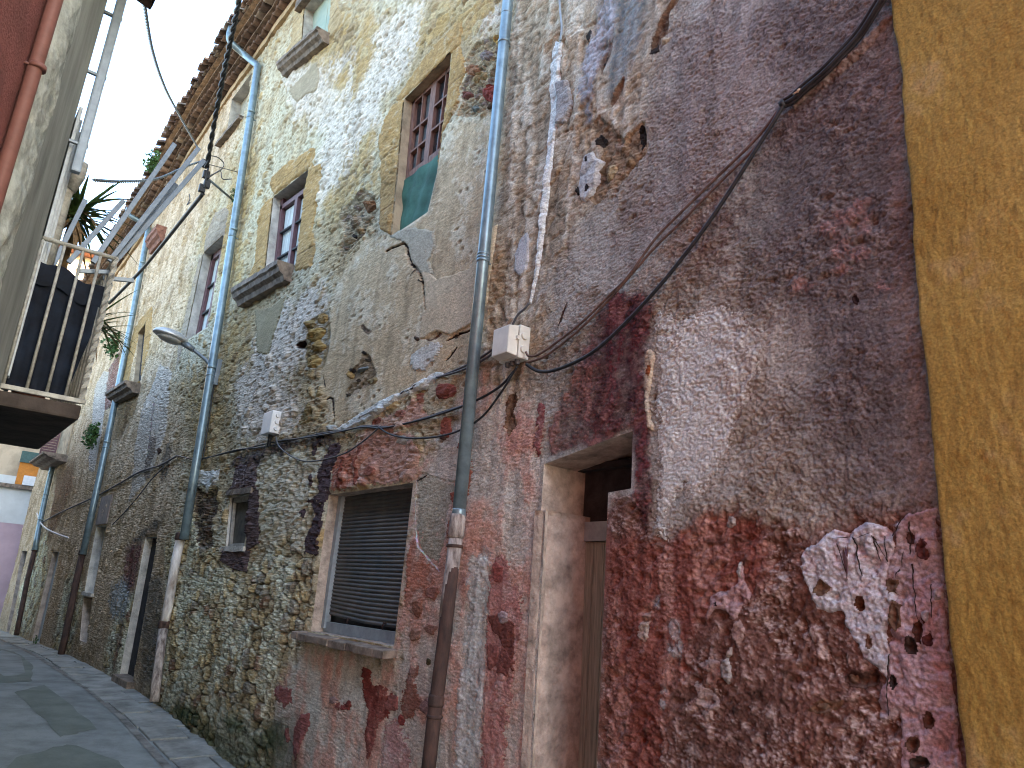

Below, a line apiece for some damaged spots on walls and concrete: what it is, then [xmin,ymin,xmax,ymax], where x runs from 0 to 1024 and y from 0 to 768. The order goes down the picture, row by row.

spalling [599,24,615,75]
spalling [649,0,679,55]
spalling [575,76,649,205]
spalling [338,189,378,256]
crack [386,243,425,298]
flaking render [303,310,331,371]
spalling [346,350,377,397]
peeling [330,383,463,641]
peeling [800,508,963,768]